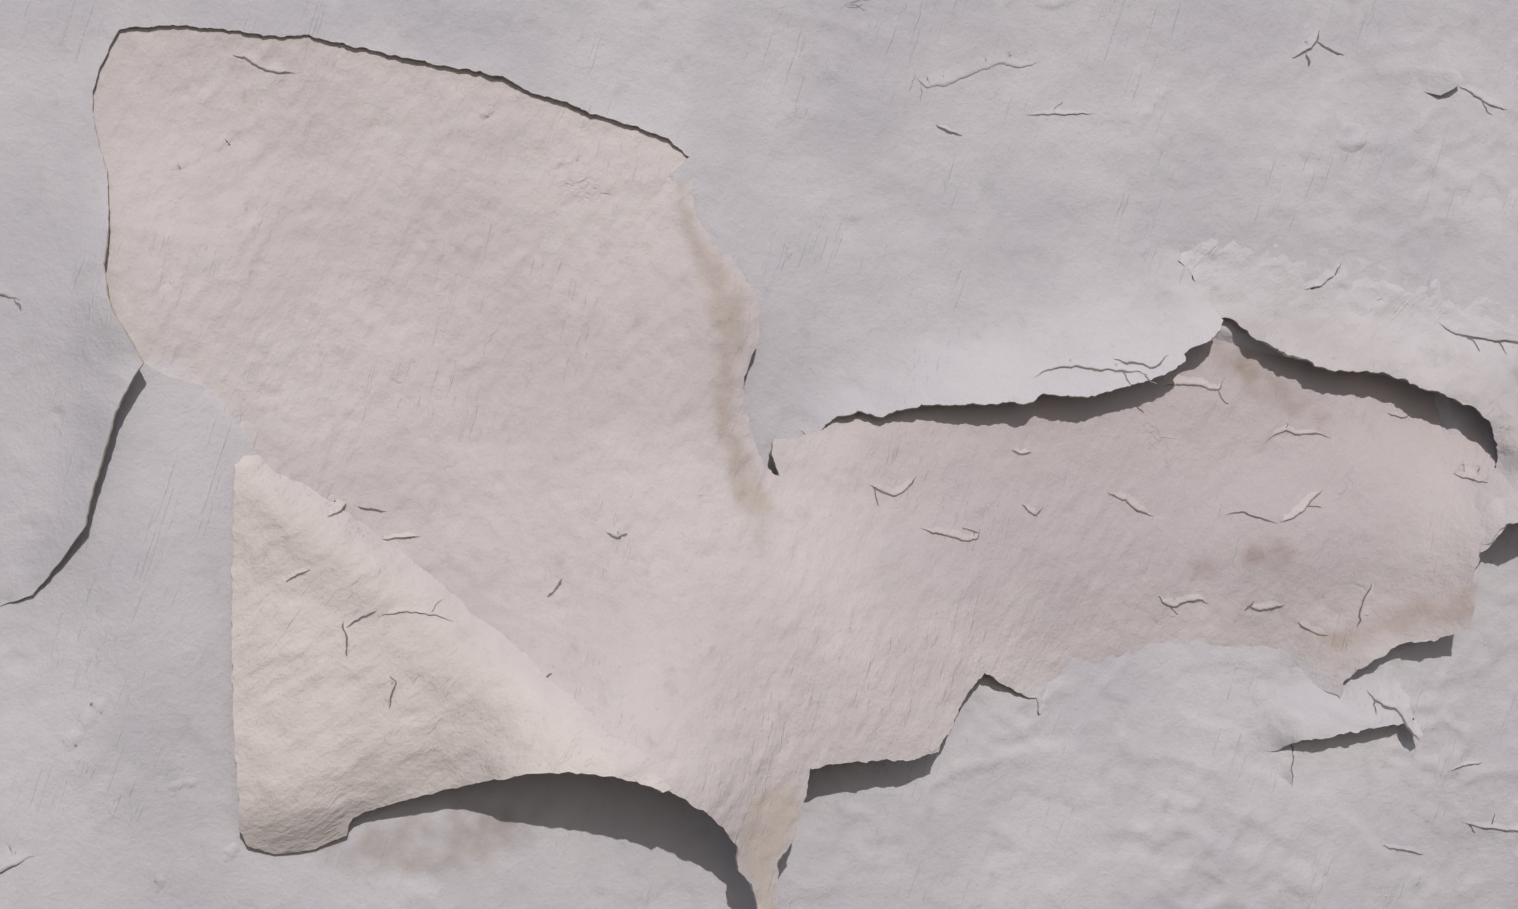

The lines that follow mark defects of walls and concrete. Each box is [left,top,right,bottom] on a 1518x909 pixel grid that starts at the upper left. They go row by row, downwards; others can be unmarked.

crack [910,50,1040,136]
crack [1292,30,1343,66]
peeling [1409,42,1463,95]
crack [1459,84,1508,114]
crack [0,282,21,310]
peeling [0,25,144,606]
peeling [799,239,1223,435]
peeling [1178,238,1518,545]
peeling [231,455,671,854]
peeling [1230,663,1411,752]
crack [1463,814,1518,833]